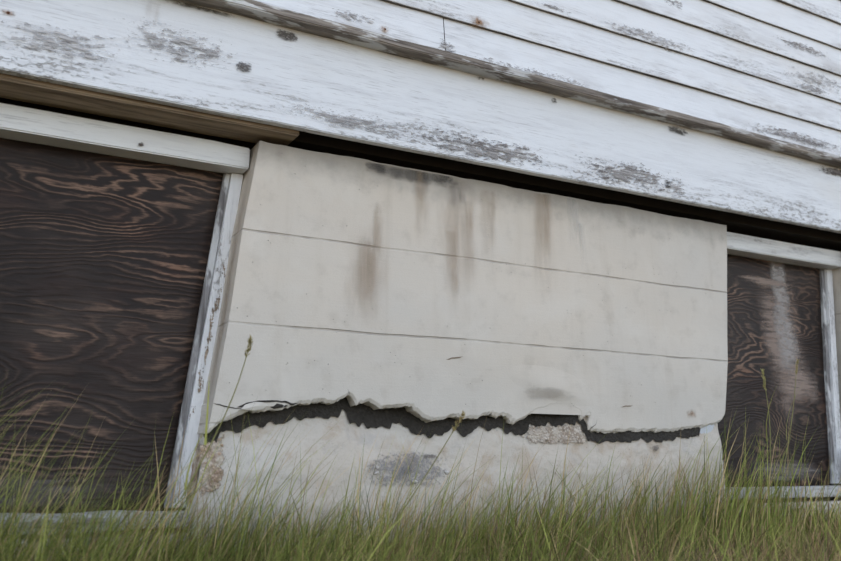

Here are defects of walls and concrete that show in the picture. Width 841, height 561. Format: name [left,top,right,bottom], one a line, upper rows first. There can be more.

peeling [1,18,251,72]
peeling [283,104,401,133]
peeling [419,126,549,167]
peeling [755,124,841,151]
peeling [575,154,684,195]
crack [204,393,701,444]
spalling [521,425,586,444]
spalling [186,434,224,506]